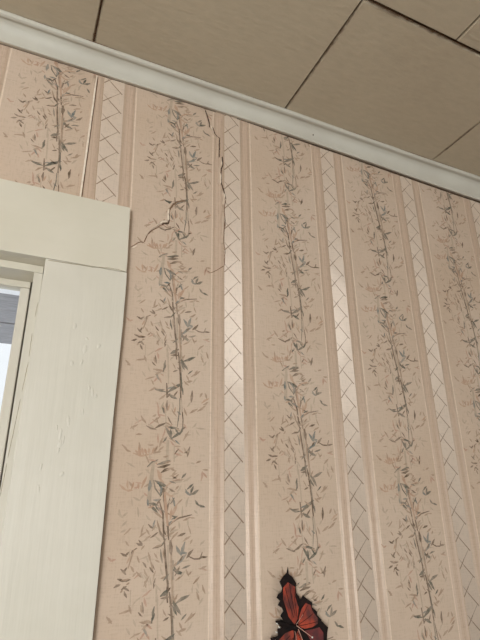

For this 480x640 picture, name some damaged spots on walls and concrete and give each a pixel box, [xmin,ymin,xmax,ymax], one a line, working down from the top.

crack [1,44,226,273]
crack [239,119,480,203]